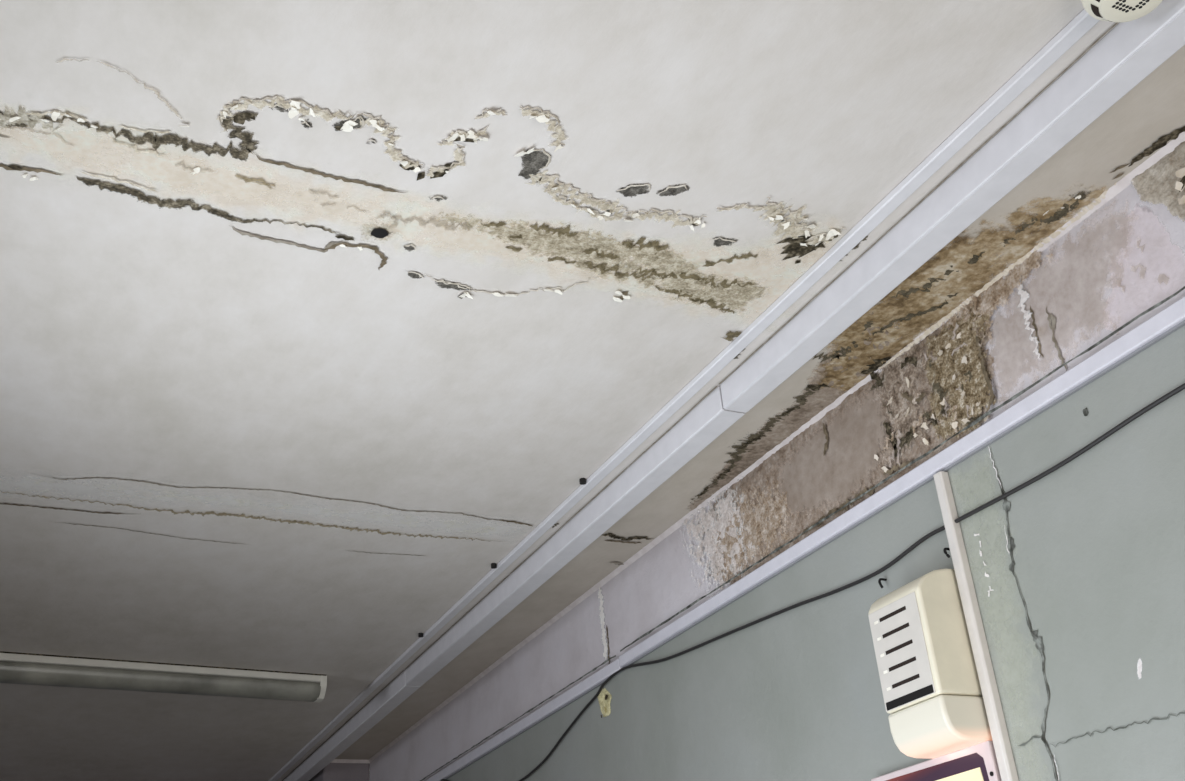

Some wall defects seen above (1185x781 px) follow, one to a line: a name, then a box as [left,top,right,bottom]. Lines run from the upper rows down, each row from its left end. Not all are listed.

crack [0,106,406,269]
damp [235,175,275,189]
peeling [217,96,507,180]
peeling [408,272,598,299]
damp [436,212,771,314]
peeling [514,106,846,264]
damp [1024,191,1091,226]
damp [990,214,1132,402]
peeling [1102,141,1185,331]
spalling [680,251,1053,595]
crack [0,474,532,556]
crack [988,447,1185,781]